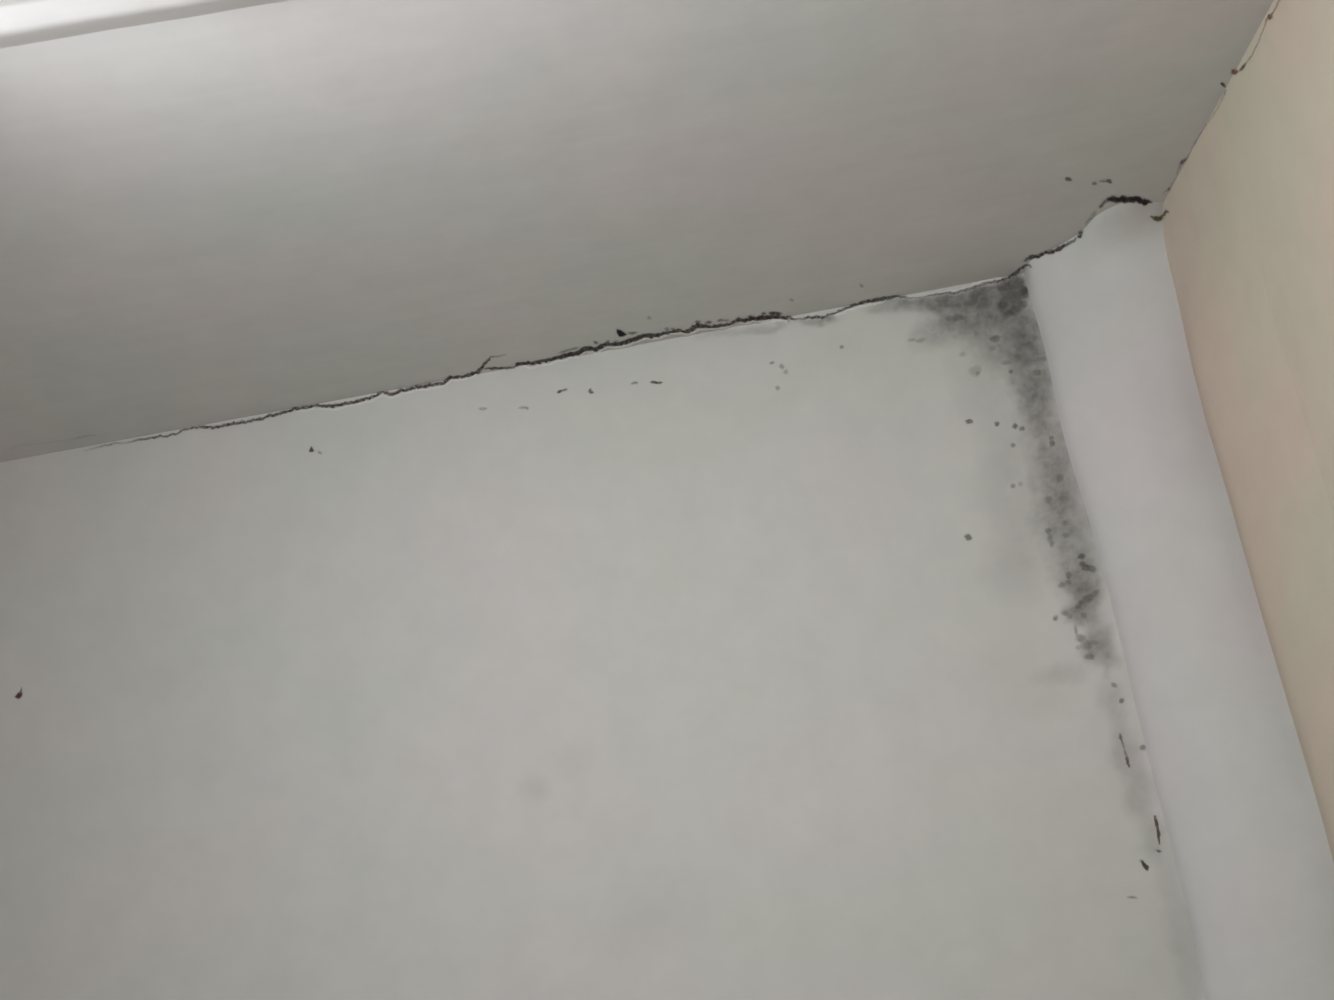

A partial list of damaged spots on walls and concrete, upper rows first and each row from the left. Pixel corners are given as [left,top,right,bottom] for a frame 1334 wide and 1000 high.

crack [139,231,1083,440]
damp [921,275,1028,315]